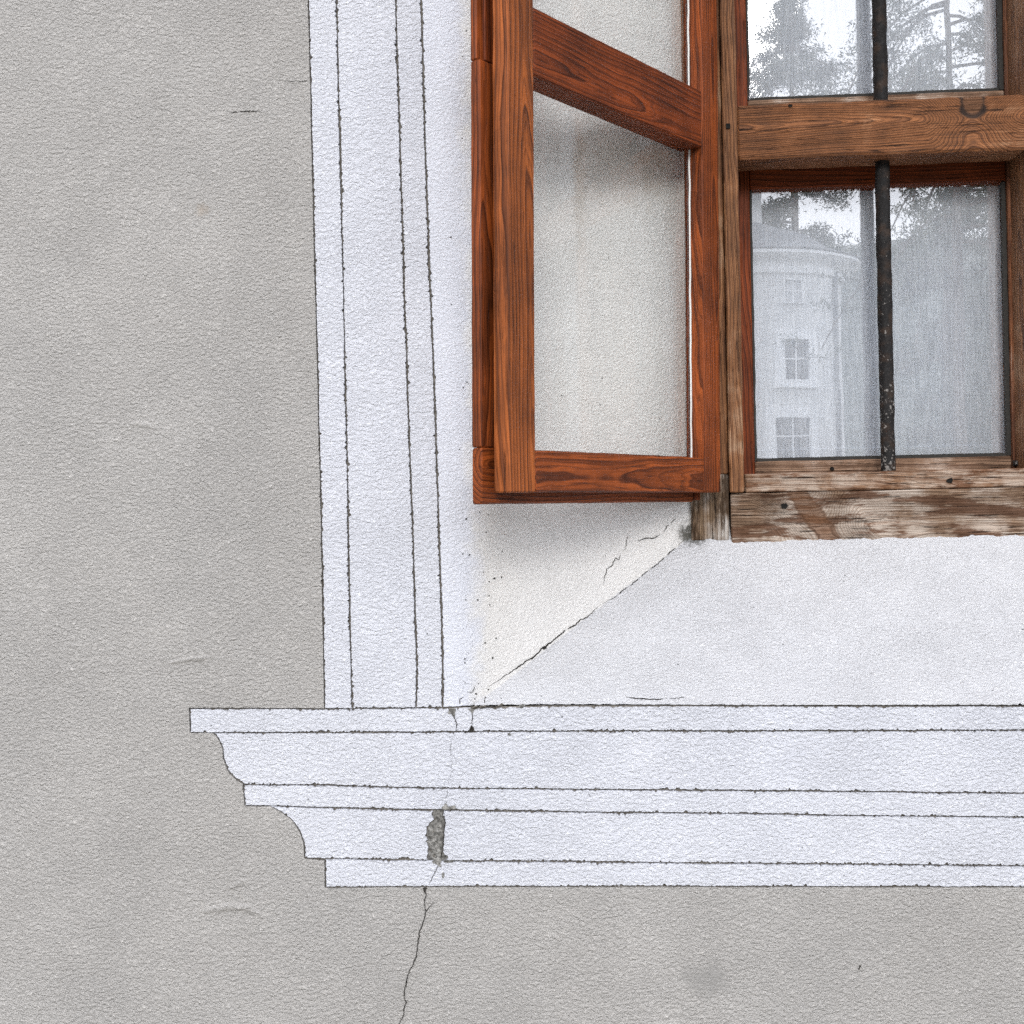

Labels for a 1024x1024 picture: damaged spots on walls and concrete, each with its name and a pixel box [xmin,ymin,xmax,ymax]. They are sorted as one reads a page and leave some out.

crack [446,519,683,797]
spalling [427,804,456,865]
crack [399,863,444,1024]